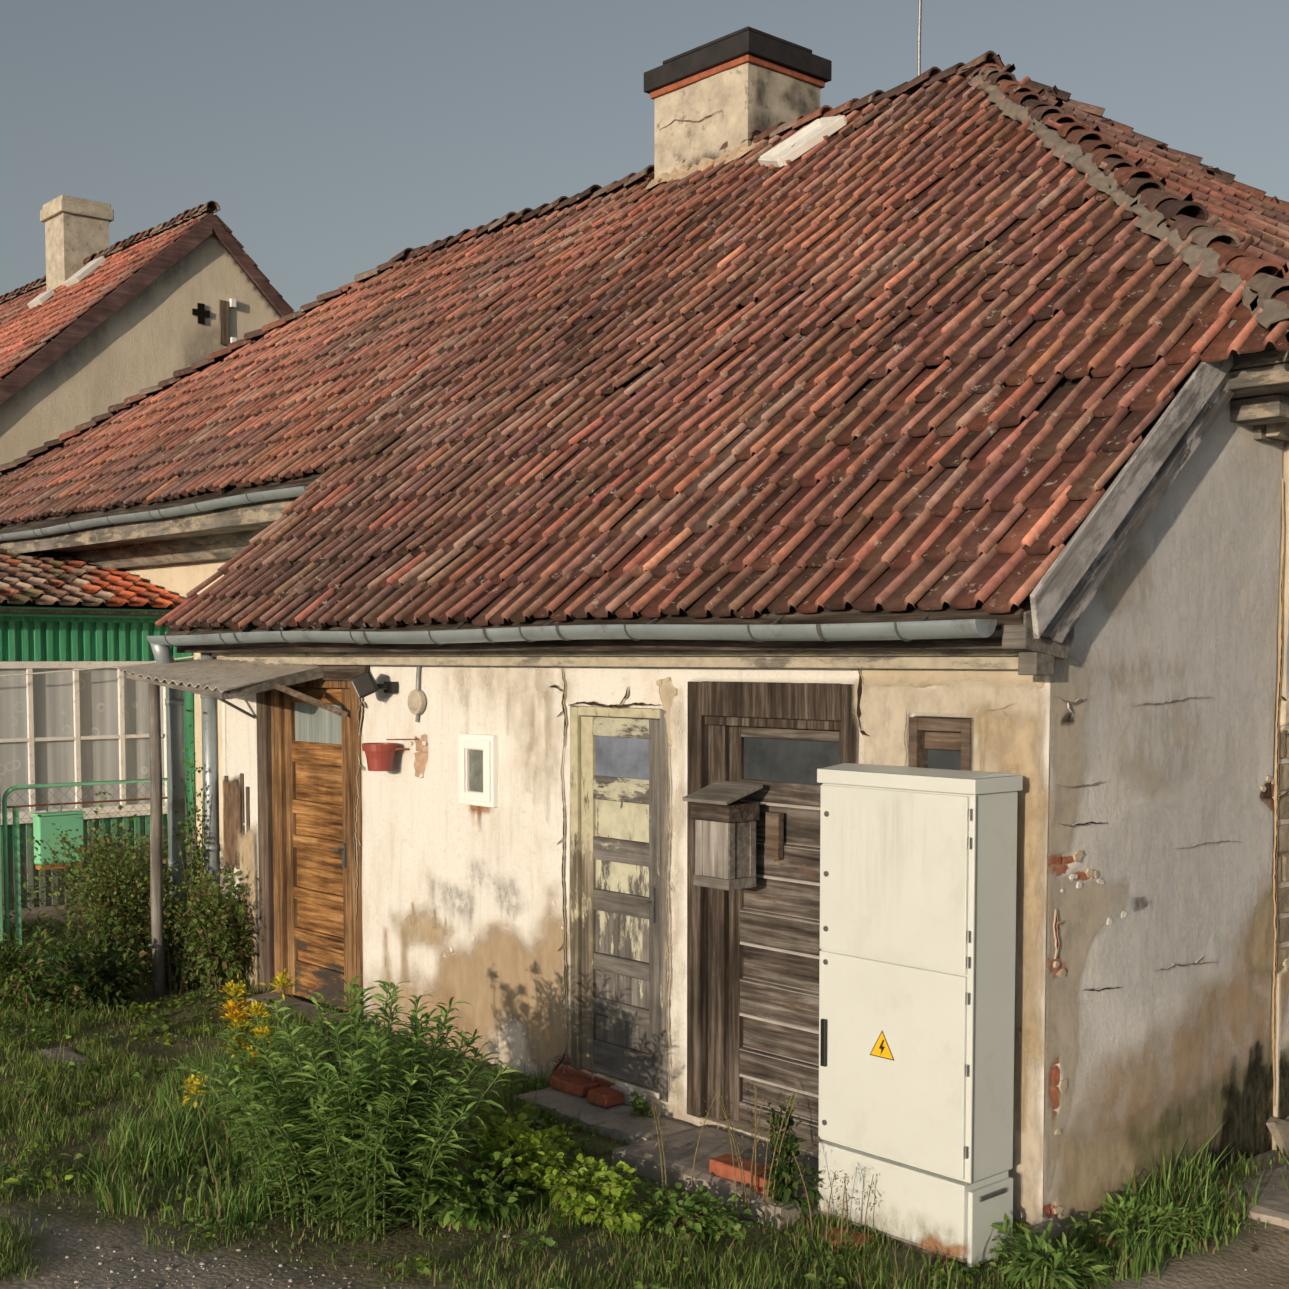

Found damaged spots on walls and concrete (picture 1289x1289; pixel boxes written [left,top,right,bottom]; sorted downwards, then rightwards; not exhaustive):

crack [659,109,723,130]
spalling [409,734,428,778]
damp [378,904,465,1051]
peeling [854,656,1184,1236]
damp [1060,890,1289,1223]
spalling [1260,698,1289,982]